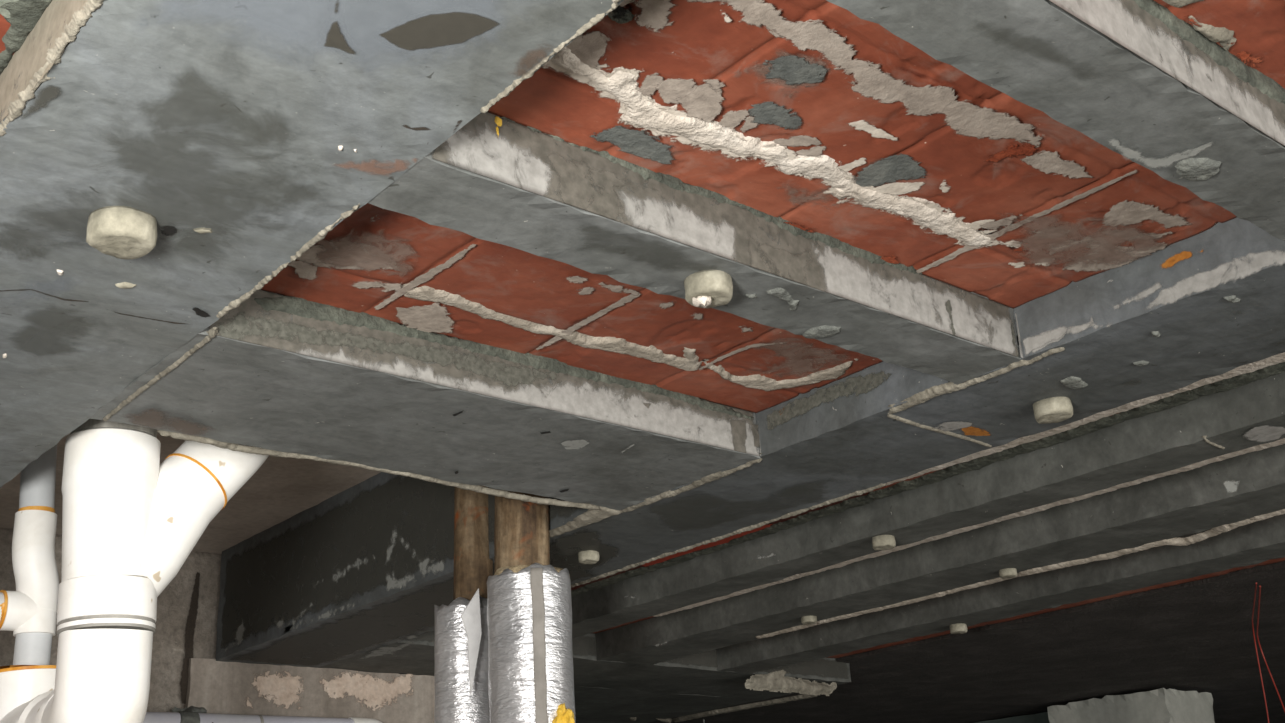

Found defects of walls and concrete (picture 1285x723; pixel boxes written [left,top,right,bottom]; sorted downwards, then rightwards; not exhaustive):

damp [380,12,499,50]
spalling [984,144,1038,163]
peeling [352,281,401,292]
peeling [692,296,711,308]
flaking render [244,671,304,709]
flaking render [319,671,414,711]
spalling [745,670,837,696]